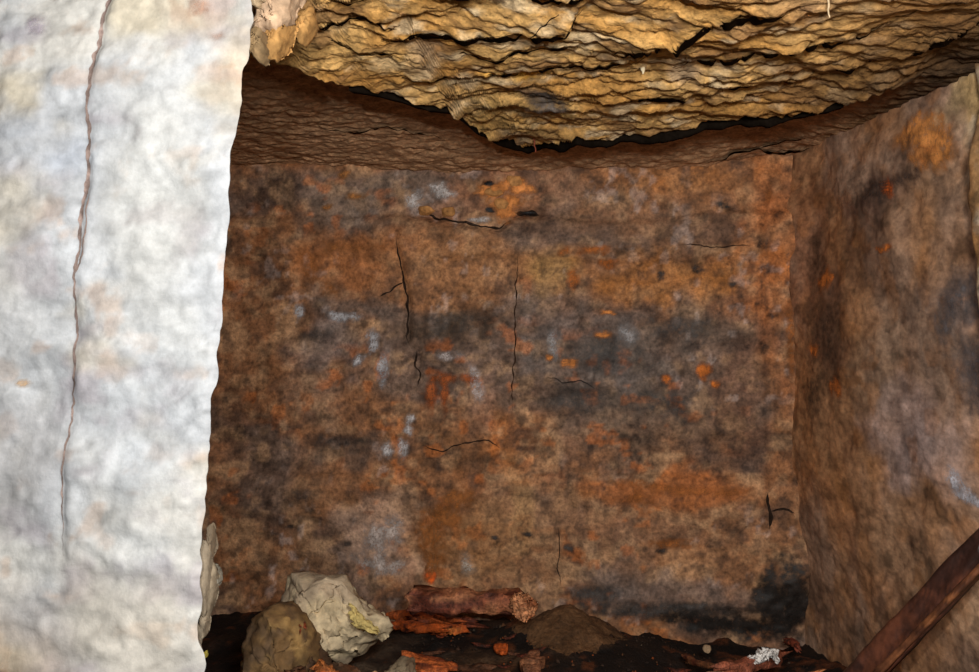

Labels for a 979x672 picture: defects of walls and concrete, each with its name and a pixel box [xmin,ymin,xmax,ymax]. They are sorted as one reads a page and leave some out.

crack [61,0,112,540]
crack [379,242,421,387]
crack [430,210,539,229]
crack [510,258,518,407]